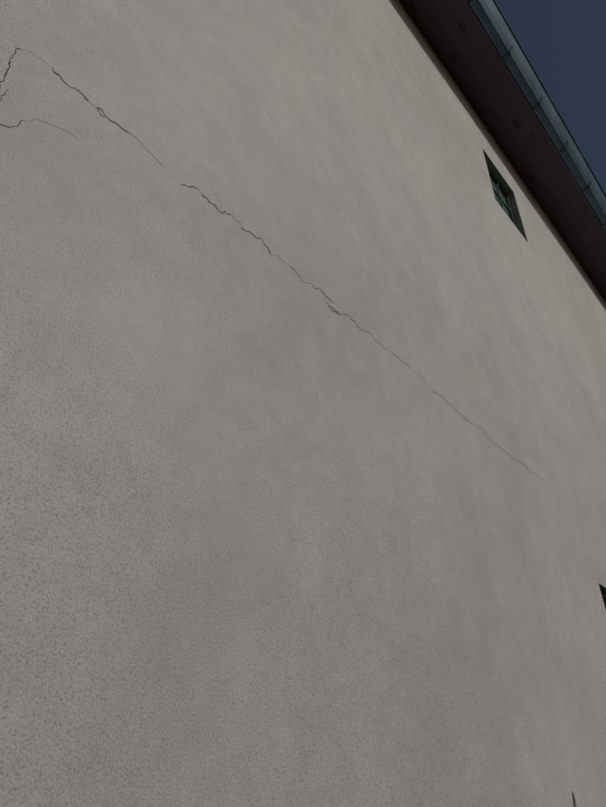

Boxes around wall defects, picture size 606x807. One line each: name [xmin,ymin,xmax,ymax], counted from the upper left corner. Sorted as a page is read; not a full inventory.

crack [0,48,165,168]